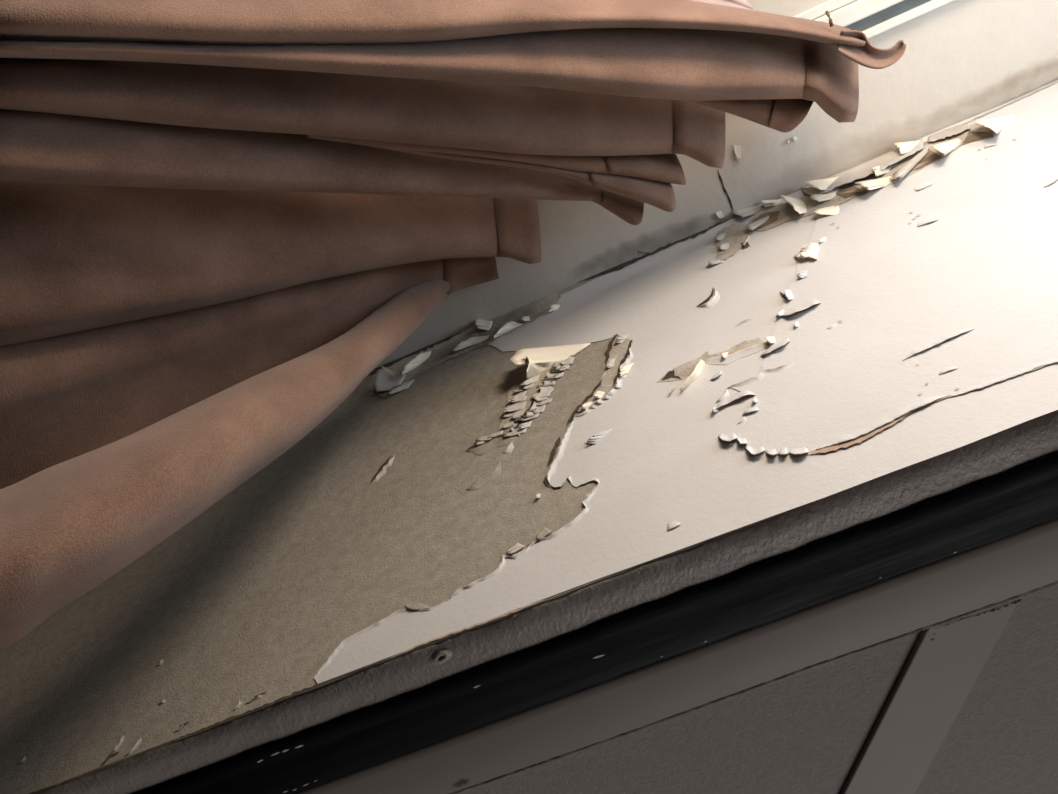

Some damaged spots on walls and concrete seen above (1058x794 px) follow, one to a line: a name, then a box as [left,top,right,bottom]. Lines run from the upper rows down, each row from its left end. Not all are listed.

peeling [708,114,1015,265]
peeling [794,237,826,278]
peeling [368,292,561,398]
peeling [656,336,790,394]
peeling [712,362,809,457]
peeling [776,289,821,327]
peeling [314,334,633,684]
peeling [100,735,142,766]